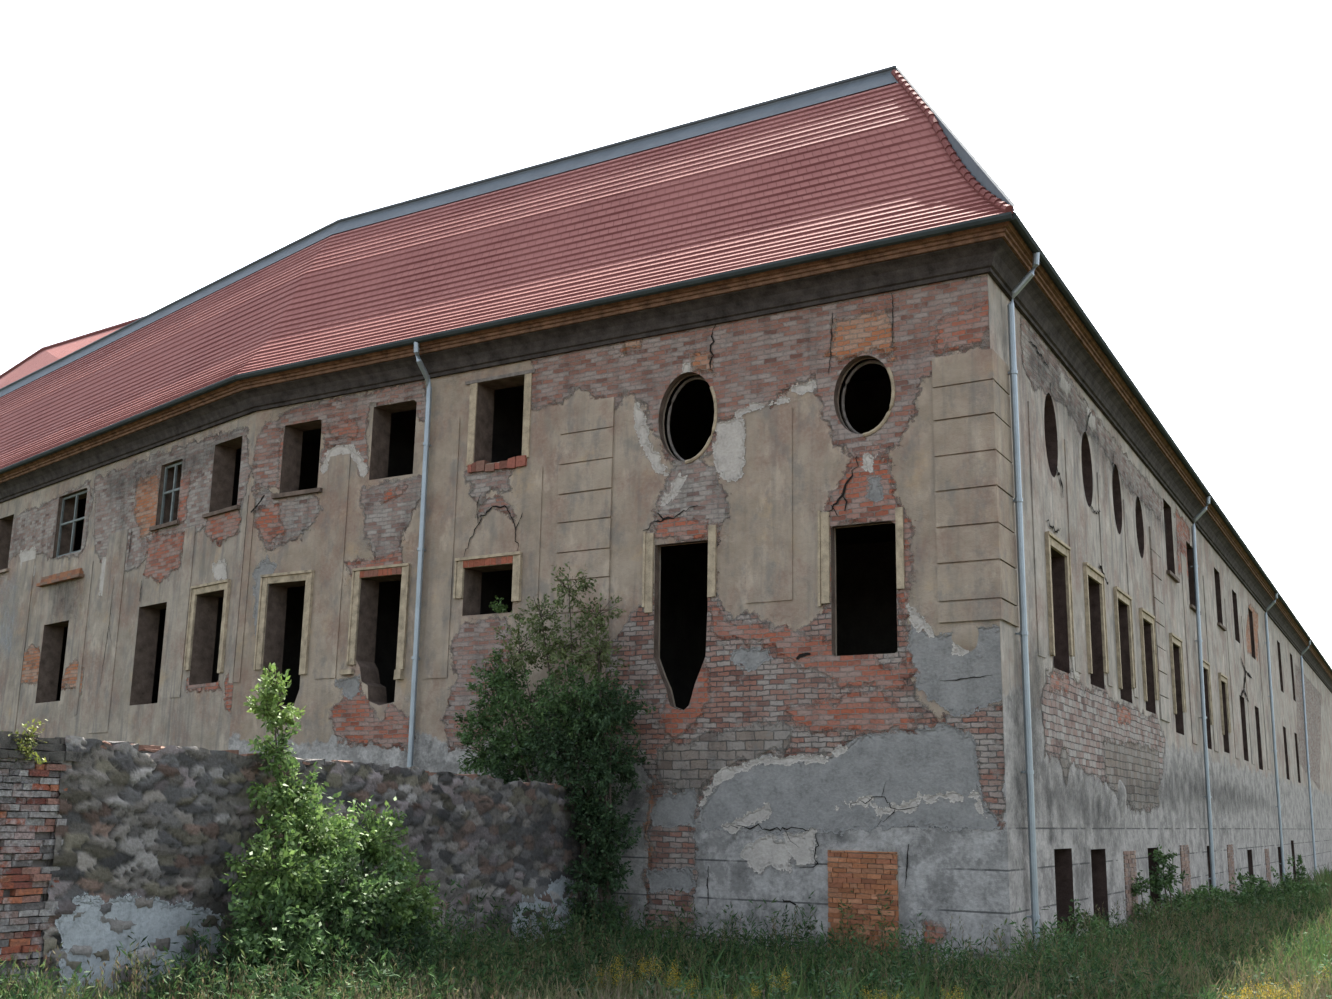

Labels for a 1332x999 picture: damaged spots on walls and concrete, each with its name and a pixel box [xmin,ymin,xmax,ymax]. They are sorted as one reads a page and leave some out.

spalling [8,380,426,636]
spalling [464,468,516,523]
crack [827,456,859,517]
spalling [531,275,1006,936]
spalling [328,674,416,753]
spalling [1041,656,1166,814]
flaking render [53,892,223,999]
flaking render [510,875,599,945]